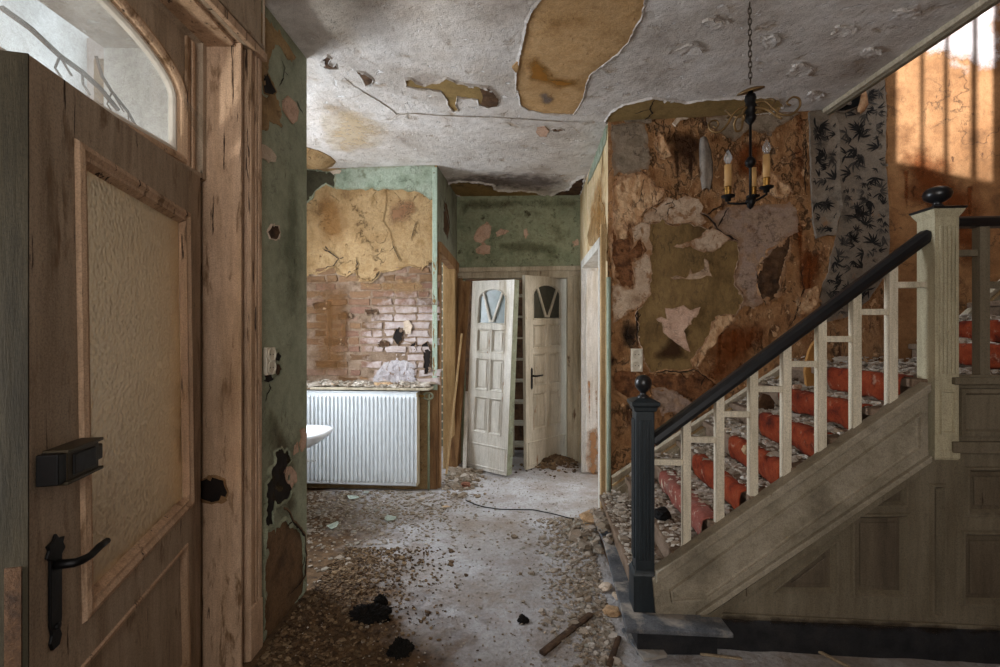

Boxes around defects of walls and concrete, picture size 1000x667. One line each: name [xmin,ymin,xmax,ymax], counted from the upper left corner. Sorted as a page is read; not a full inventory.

flaking render [261,12,299,131]
flaking render [404,77,500,113]
flaking render [512,0,647,137]
crack [316,190,418,283]
flaking render [307,260,442,386]
peeling [474,222,509,255]
flaking render [307,97,786,241]
flaking render [572,170,744,402]
peeling [757,171,793,202]
flaking render [756,235,794,305]
peeling [796,286,822,318]
flaking render [262,428,307,643]